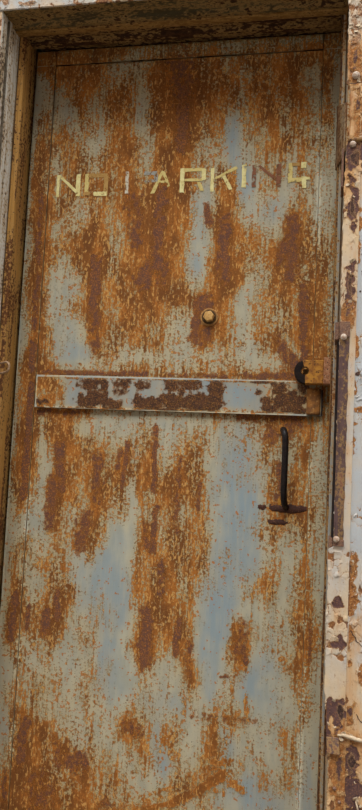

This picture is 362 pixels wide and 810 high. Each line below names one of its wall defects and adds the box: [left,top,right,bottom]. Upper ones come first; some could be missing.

peeling [0,0,36,9]
rust [67,592,104,655]
rust [245,740,277,795]
rust [325,697,362,810]